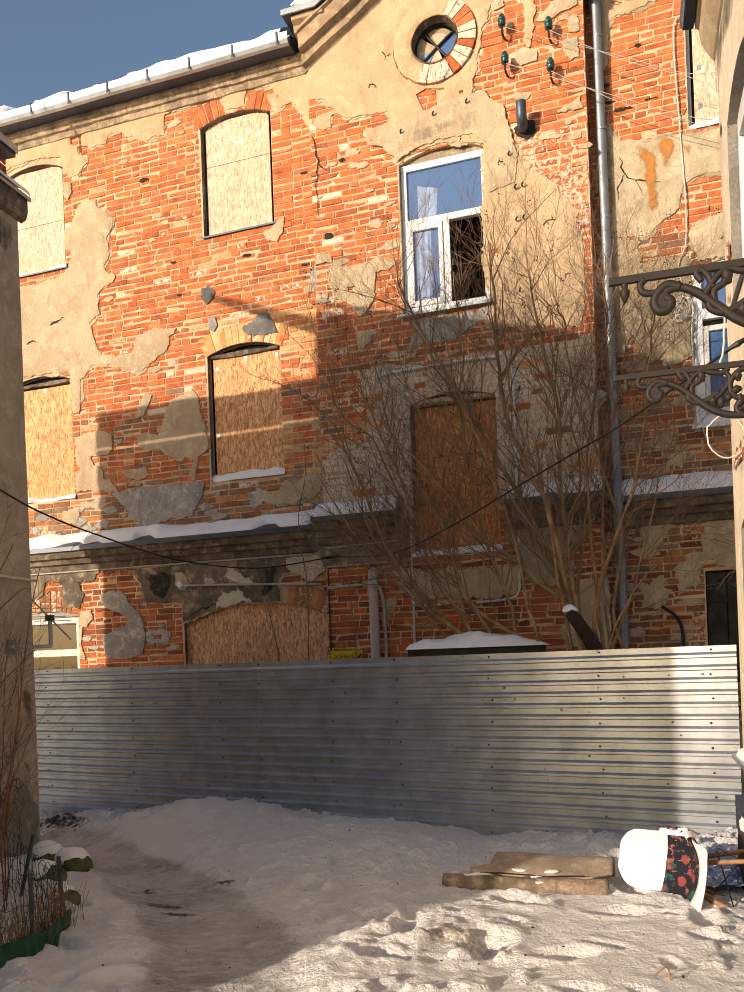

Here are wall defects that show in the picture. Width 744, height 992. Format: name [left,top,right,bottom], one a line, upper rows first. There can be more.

crack [311,135,326,216]
crack [617,157,660,200]
rust [640,138,673,209]
flaking render [20,251,71,286]
flaking render [63,0,736,659]
peeling [31,514,50,534]
flaking render [35,569,184,668]